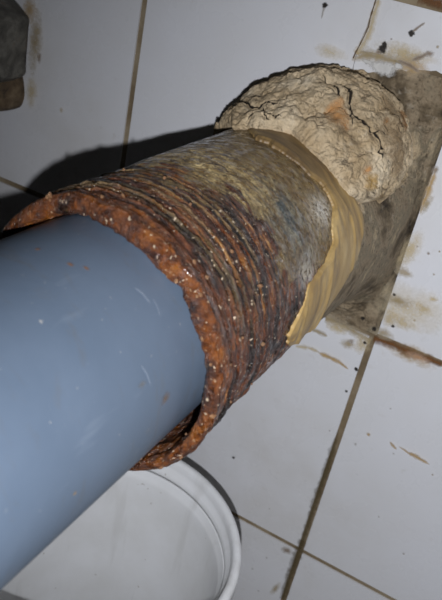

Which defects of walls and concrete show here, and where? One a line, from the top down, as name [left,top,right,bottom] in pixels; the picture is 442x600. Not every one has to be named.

crack [239,101,282,120]
crack [324,76,385,158]
rust [373,331,442,366]